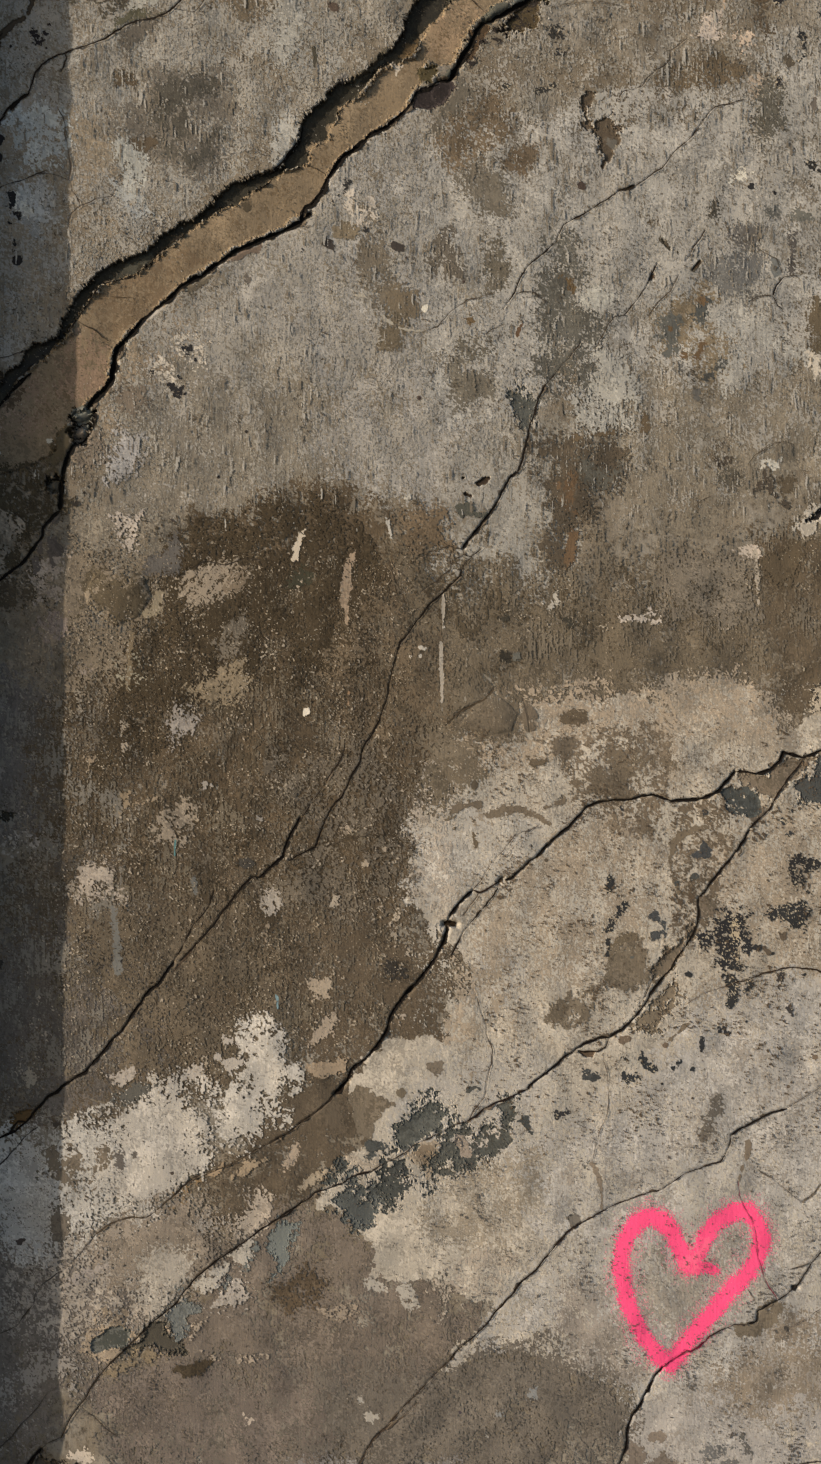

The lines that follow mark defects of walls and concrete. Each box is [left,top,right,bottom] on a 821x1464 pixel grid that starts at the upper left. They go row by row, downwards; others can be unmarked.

crack [0,0,617,581]
crack [430,99,747,334]